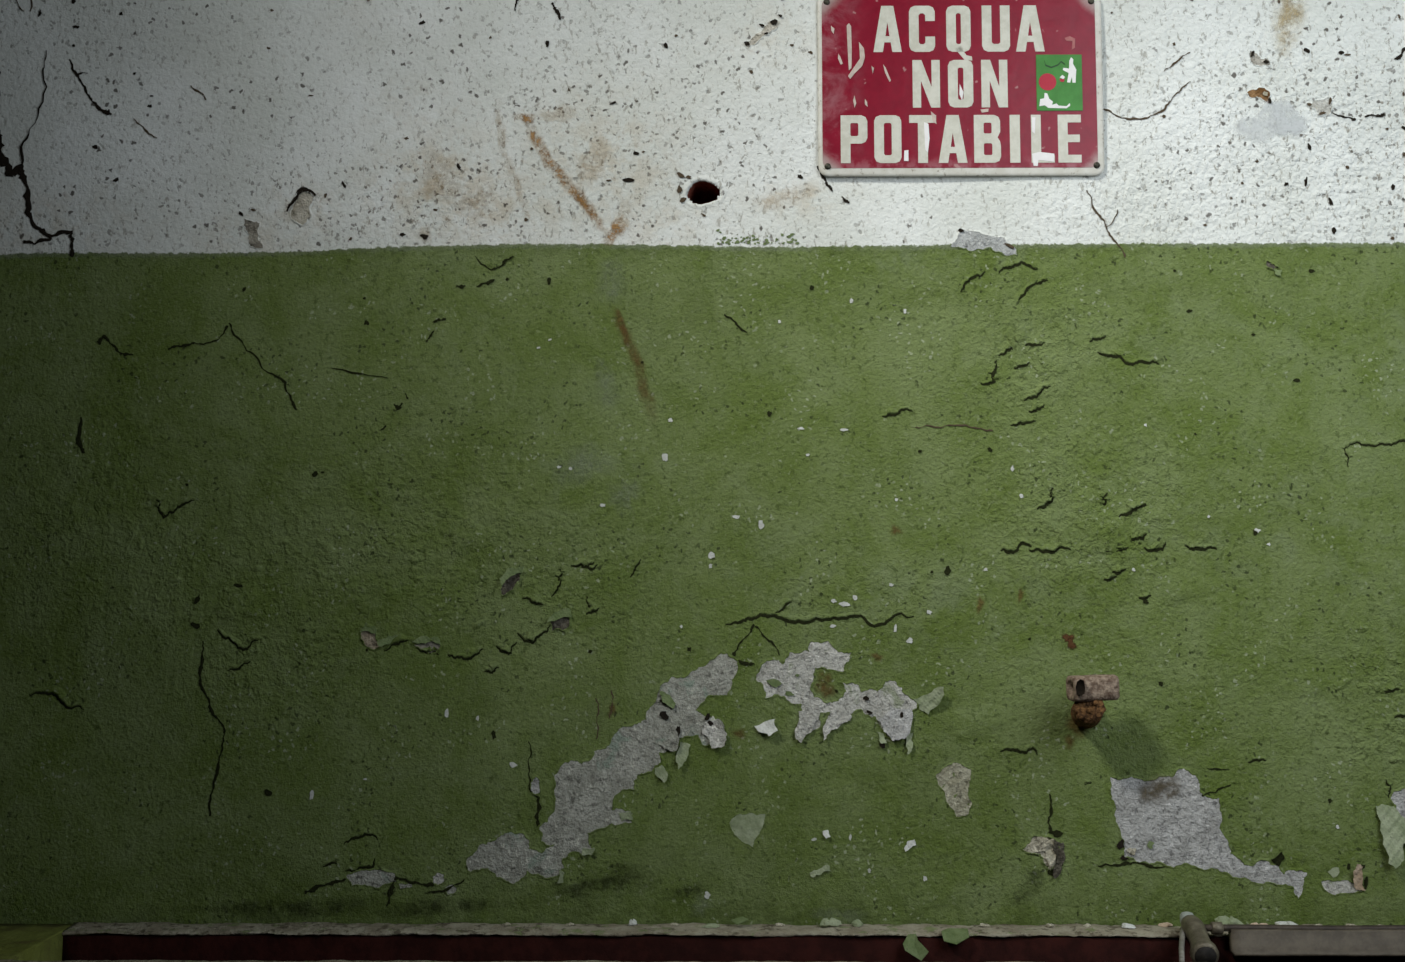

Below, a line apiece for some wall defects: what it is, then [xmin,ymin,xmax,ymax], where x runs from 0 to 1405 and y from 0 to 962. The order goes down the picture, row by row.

crack [0,50,157,257]
corrosion [521,114,622,241]
crack [1333,113,1385,121]
spalling [948,228,1018,257]
crack [882,259,1051,431]
crack [1000,486,1071,554]
crack [1098,492,1217,601]
crack [725,598,914,666]
peeling [344,622,944,896]
peeling [934,760,974,819]
peeling [1107,767,1368,901]
peeling [1376,786,1405,869]